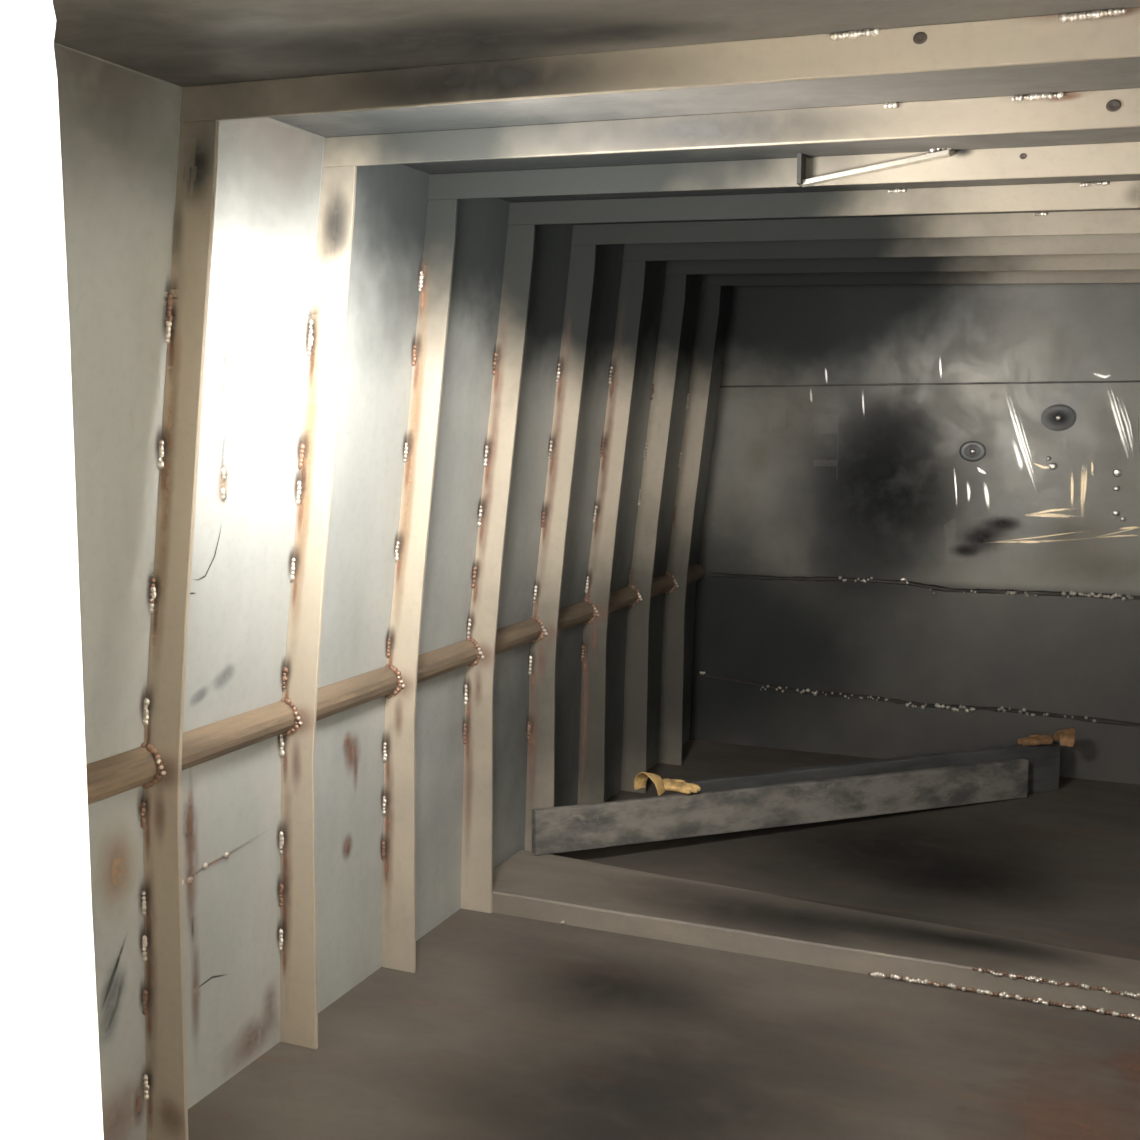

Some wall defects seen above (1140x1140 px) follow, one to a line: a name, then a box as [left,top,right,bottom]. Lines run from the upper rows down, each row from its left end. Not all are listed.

rust [164,286,176,366]
rust [306,313,316,382]
rust [157,409,172,530]
rust [295,398,314,524]
rust [395,339,420,576]
rust [484,436,494,478]
rust [148,575,159,631]
rust [289,553,299,596]
rust [141,693,152,745]
rust [381,791,391,876]
rust [277,828,289,967]
rust [140,885,153,1035]